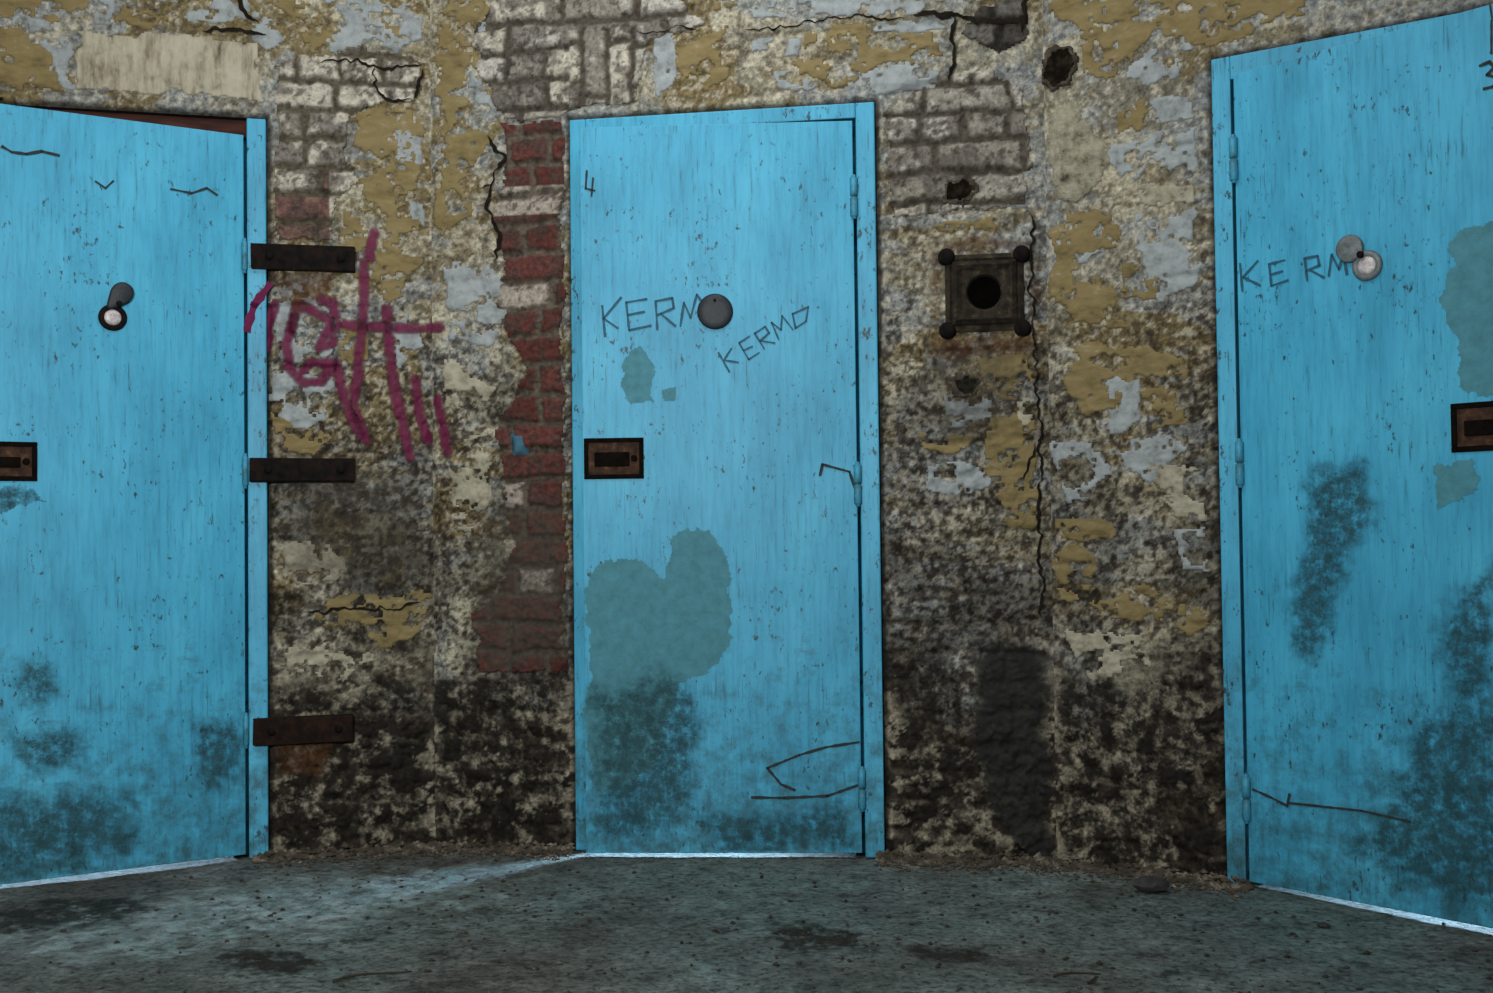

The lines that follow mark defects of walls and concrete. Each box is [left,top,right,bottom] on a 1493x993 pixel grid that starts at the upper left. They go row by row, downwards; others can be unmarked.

crack [635,25,697,34]
crack [745,0,1028,80]
spalling [0,0,1032,835]
peeling [918,0,1305,682]
peeling [1294,468,1370,653]
peeling [1433,458,1480,509]
peeling [1439,221,1493,397]
damp [269,671,568,848]
damp [896,642,1006,853]
damp [1058,661,1225,875]